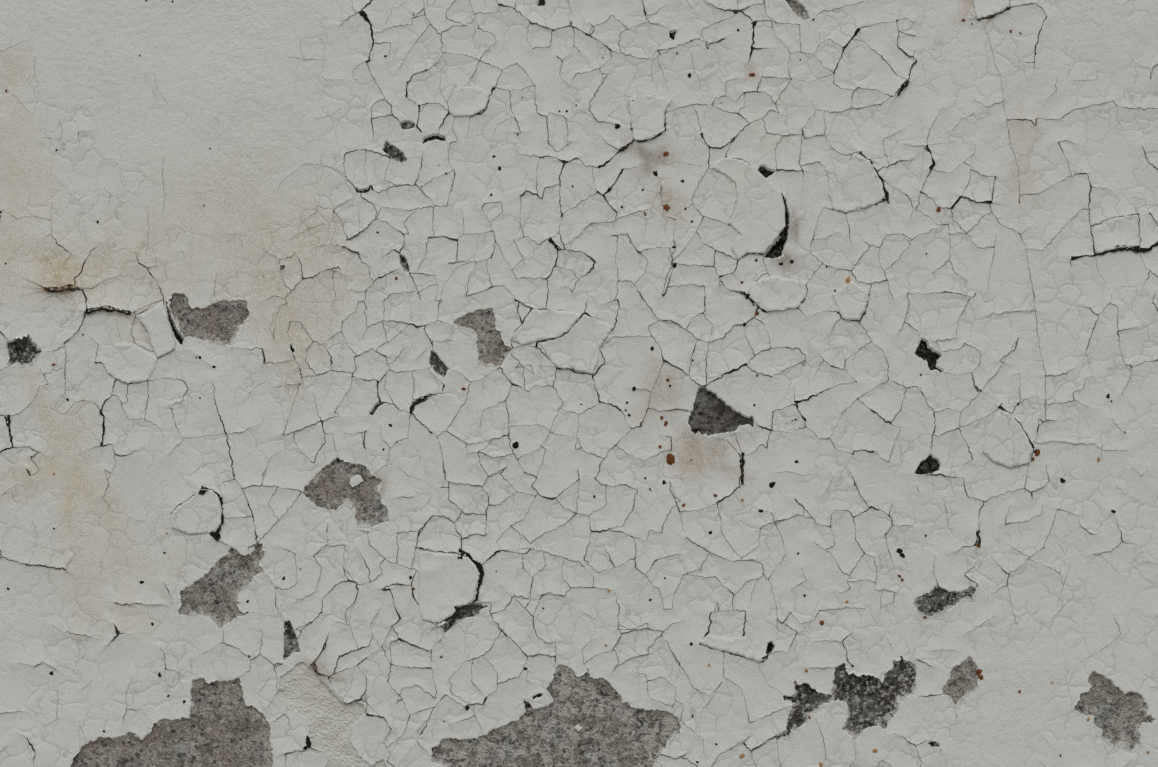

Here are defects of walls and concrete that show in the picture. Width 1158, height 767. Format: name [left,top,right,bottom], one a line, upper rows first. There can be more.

crack [797,0,1158,547]
crack [0,212,172,497]
crack [72,340,302,553]
crack [231,0,917,767]
peeling [688,388,756,436]
crack [55,581,170,644]
peeling [177,542,267,629]
peeling [69,678,273,767]
crack [202,629,324,766]
peeling [431,665,694,767]
peeling [776,654,918,740]
peeling [1071,672,1154,752]